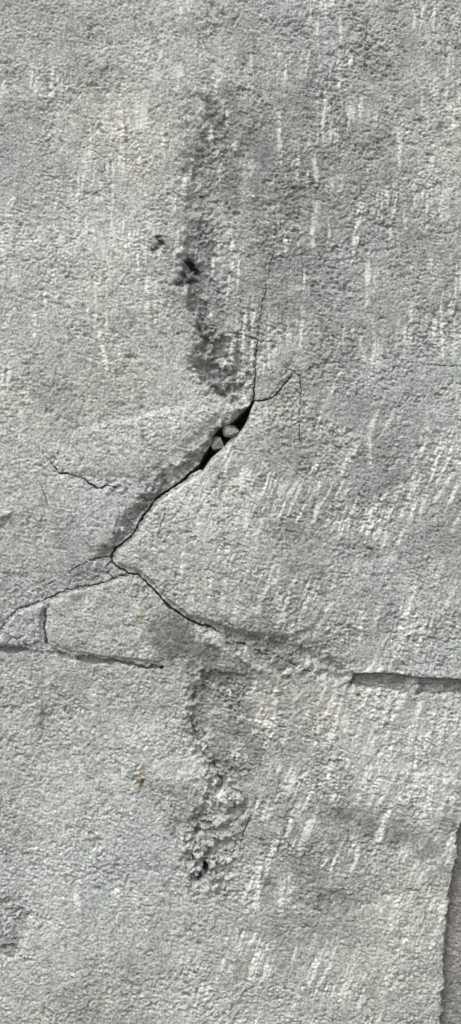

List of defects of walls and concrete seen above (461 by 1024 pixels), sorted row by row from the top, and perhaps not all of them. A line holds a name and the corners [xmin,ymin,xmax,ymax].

leakage [196,103,229,143]
leakage [173,177,187,211]
crack [0,244,346,672]